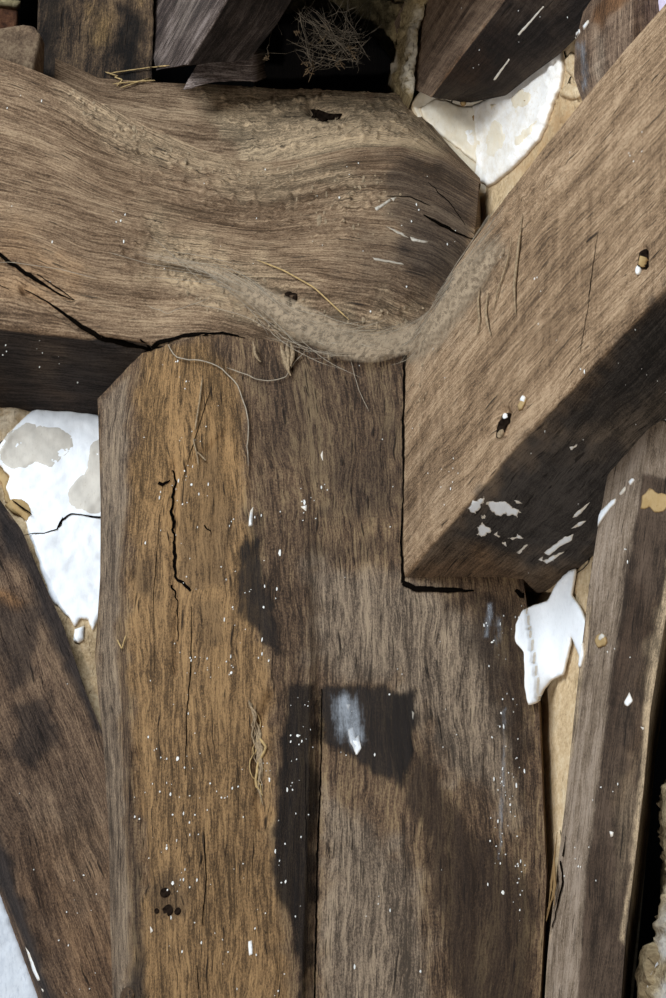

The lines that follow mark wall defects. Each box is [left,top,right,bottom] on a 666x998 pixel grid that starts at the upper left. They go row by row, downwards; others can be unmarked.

peeling [419,51,565,187]
crack [0,253,245,351]
peeling [0,410,101,643]
crack [26,513,101,535]
crack [153,392,210,773]
peeling [515,569,585,705]
water stain [272,684,535,998]
crack [552,831,566,928]